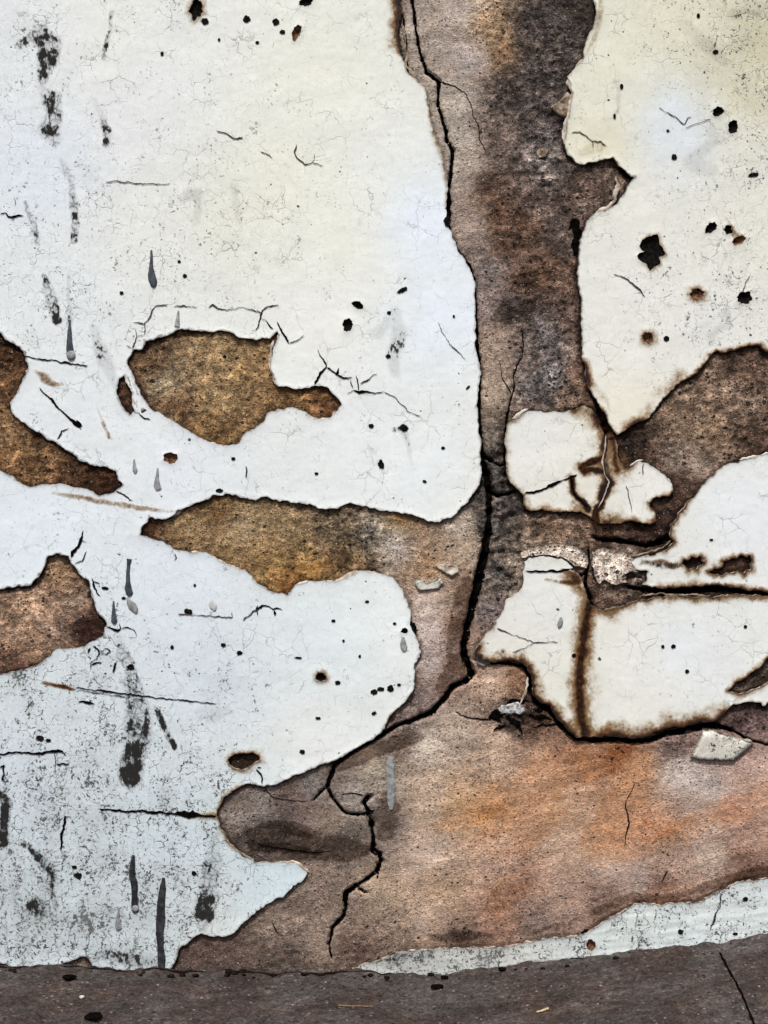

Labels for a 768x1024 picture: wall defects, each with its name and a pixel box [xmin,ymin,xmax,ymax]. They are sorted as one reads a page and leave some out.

peeling [0,333,122,496]
peeling [141,0,768,972]
crack [256,0,768,957]
peeling [0,554,108,674]
peeling [65,957,96,967]